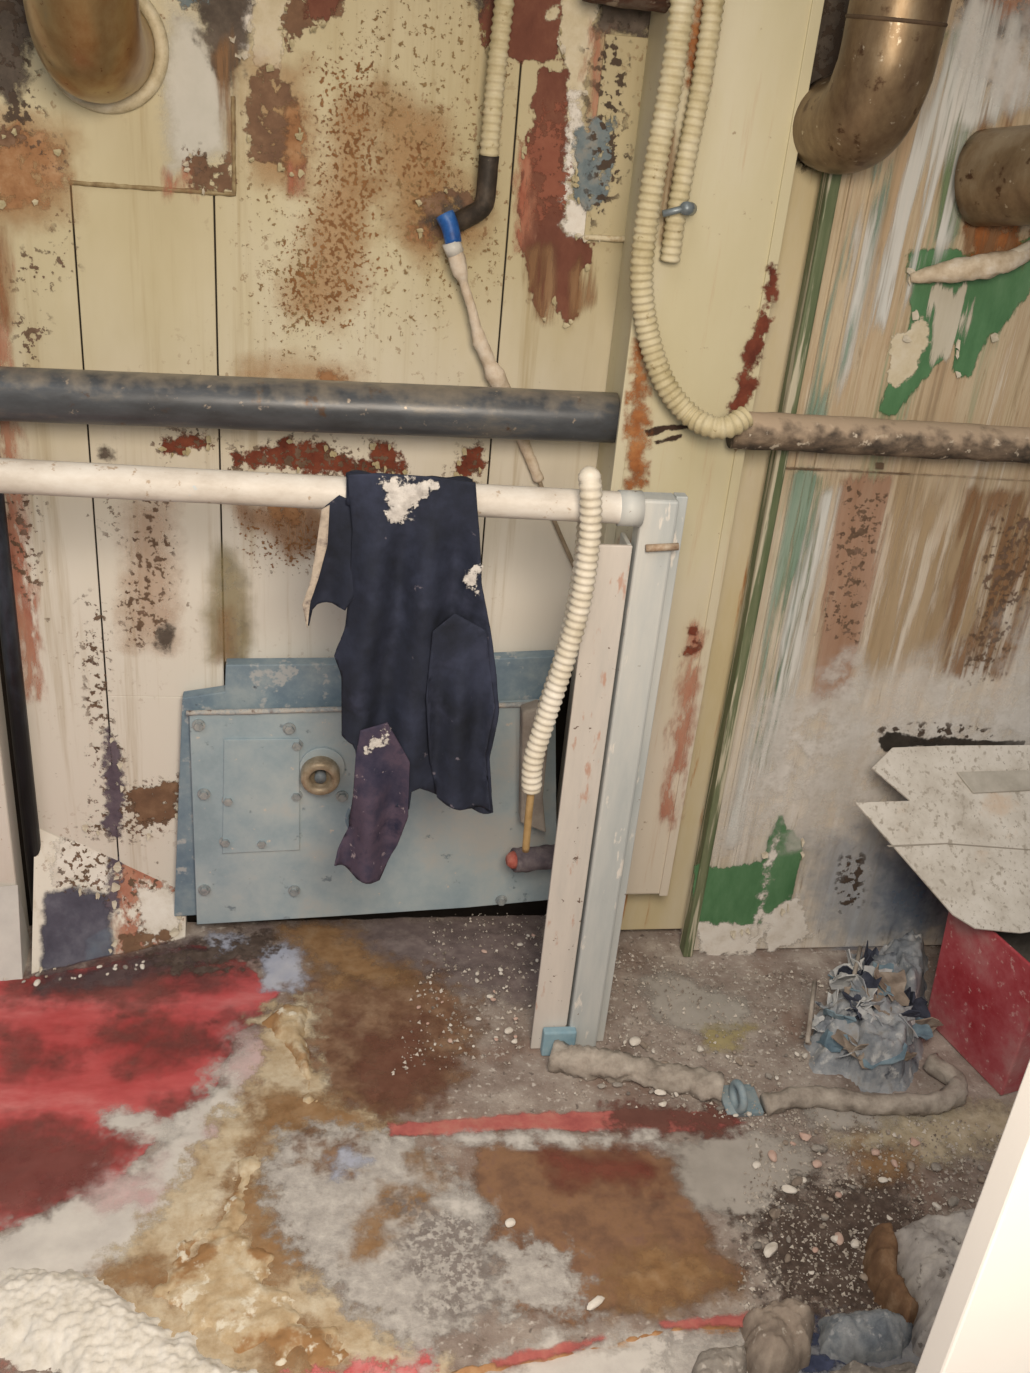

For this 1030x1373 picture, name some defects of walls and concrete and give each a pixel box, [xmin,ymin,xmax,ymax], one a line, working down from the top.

peeling [229,0,344,70]
peeling [476,0,495,58]
corrosion [165,0,497,381]
peeling [507,0,631,328]
corrosion [728,263,779,413]
peeling [879,113,1030,416]
corrosion [5,493,43,699]
corrosion [82,499,175,763]
corrosion [237,505,321,572]
corrosion [813,472,891,702]
peeling [39,728,182,973]
peeling [693,815,813,956]